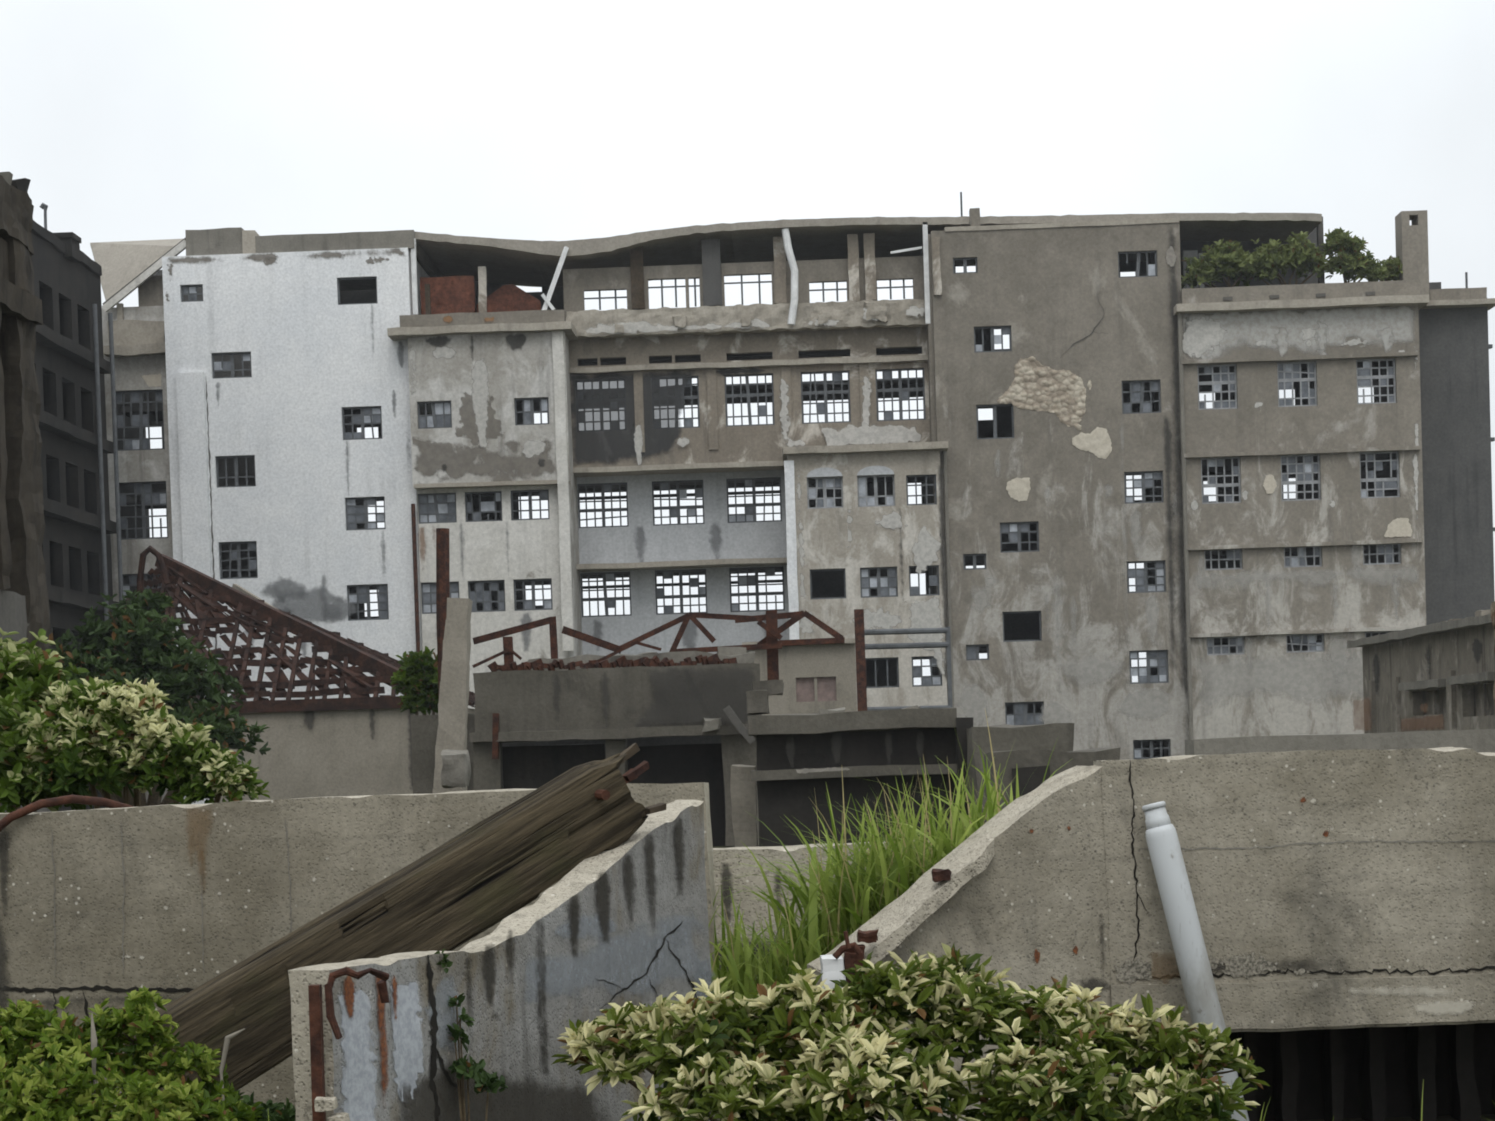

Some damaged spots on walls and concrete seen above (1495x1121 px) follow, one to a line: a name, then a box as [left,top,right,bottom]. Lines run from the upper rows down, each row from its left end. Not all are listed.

peeling [585,319,770,334]
peeling [409,346,455,395]
peeling [412,359,555,481]
spalling [997,356,1092,431]
corrosion [488,653,737,672]
leakage [569,835,656,956]
leakage [675,818,685,890]
crack [1113,761,1495,979]
corrosion [344,976,355,1017]
corrosion [376,976,398,1092]
leakage [467,930,514,1017]
crack [595,921,697,1009]